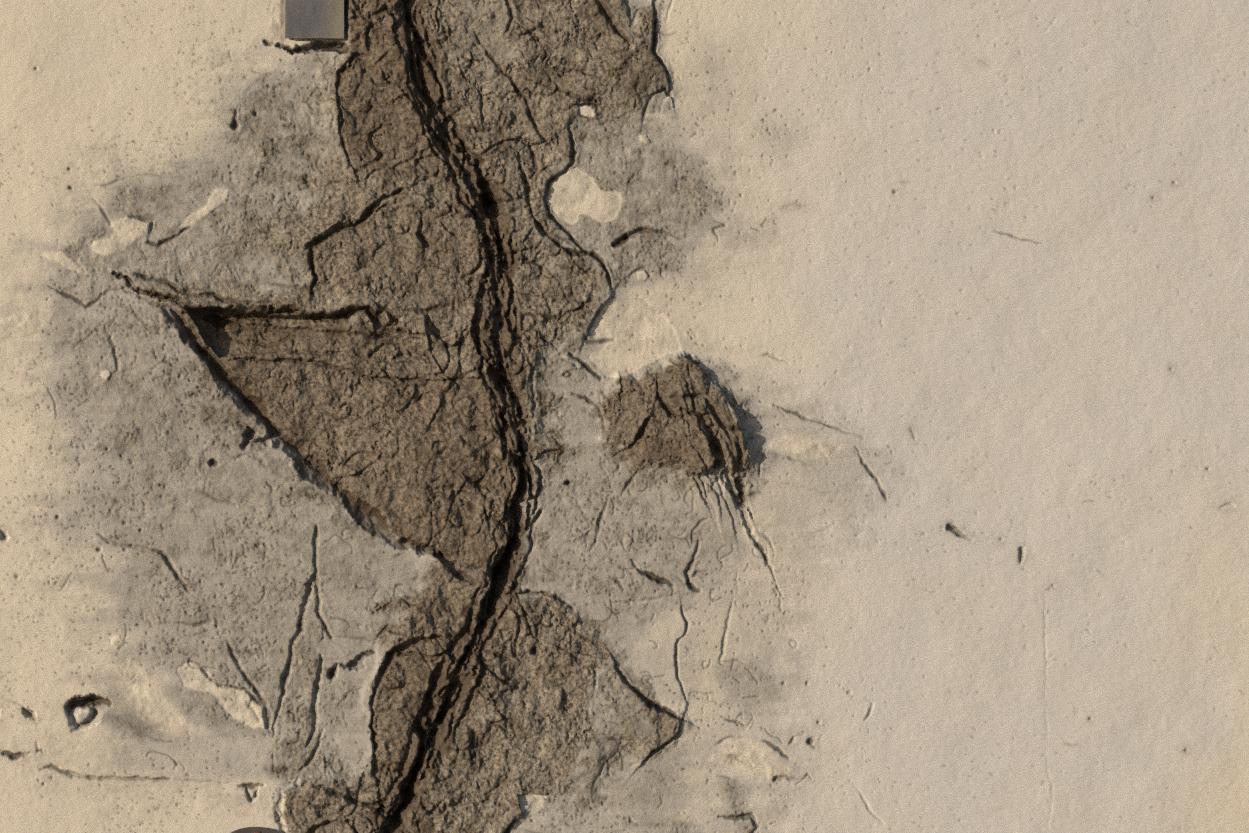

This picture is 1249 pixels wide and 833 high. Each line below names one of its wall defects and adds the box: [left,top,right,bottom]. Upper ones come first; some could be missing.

peeling [39,252,84,274]
peeling [92,217,151,257]
spalling [138,0,481,377]
spalling [433,0,684,379]
crack [0,0,888,833]
peeling [114,659,186,726]
peeling [177,663,266,729]
spalling [275,608,437,833]
spalling [419,558,468,626]
spalling [429,595,681,833]